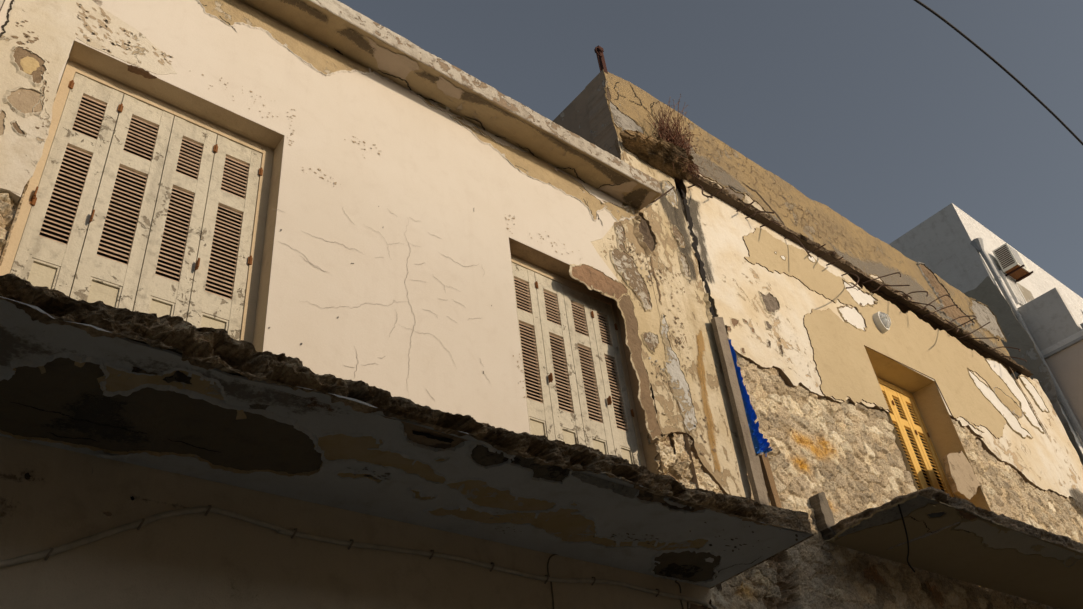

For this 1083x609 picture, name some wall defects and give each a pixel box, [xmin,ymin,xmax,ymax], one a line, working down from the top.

crack [0,0,14,37]
peeling [76,2,173,66]
flaking render [0,20,49,143]
flaking render [196,0,717,460]
crack [278,208,489,401]
flaking render [837,279,878,332]
flaking render [916,262,1007,342]
spalling [0,273,814,589]
flaking render [967,358,1050,439]